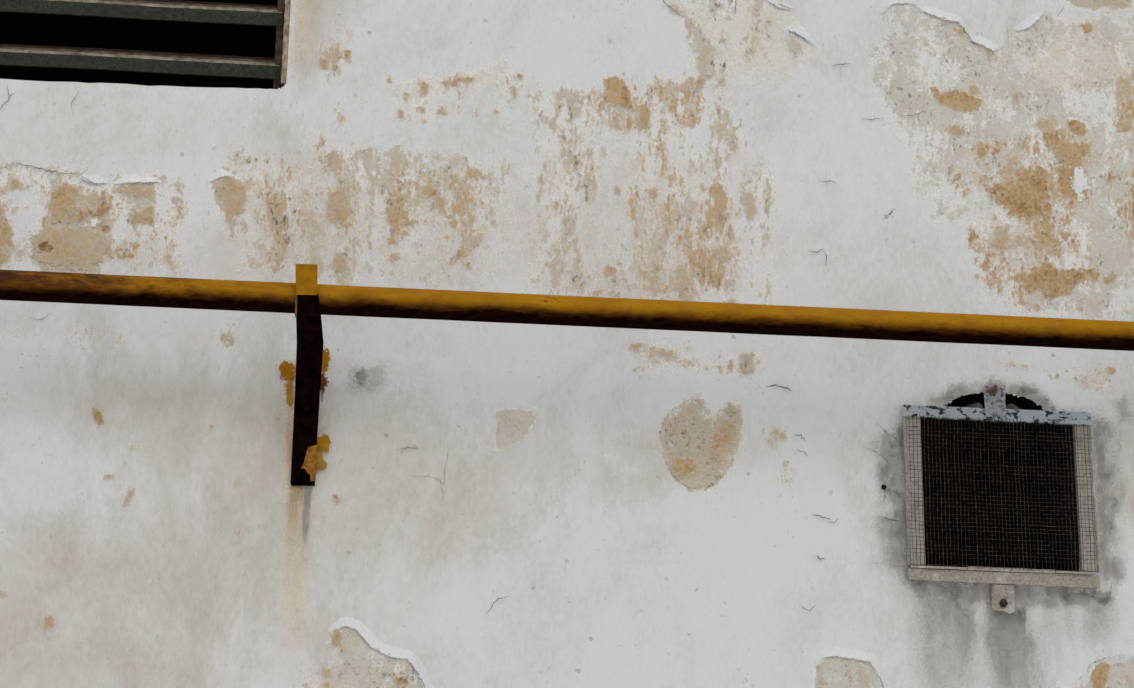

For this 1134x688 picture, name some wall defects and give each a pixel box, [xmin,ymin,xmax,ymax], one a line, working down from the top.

peeling [202,0,817,305]
peeling [861,0,1134,320]
peeling [0,159,191,278]
peeling [624,338,760,388]
peeling [657,393,743,492]
water stain [930,379,1056,411]
water stain [875,395,1132,688]
peeling [297,616,435,688]
peeling [814,647,886,688]
peeling [1060,651,1134,688]